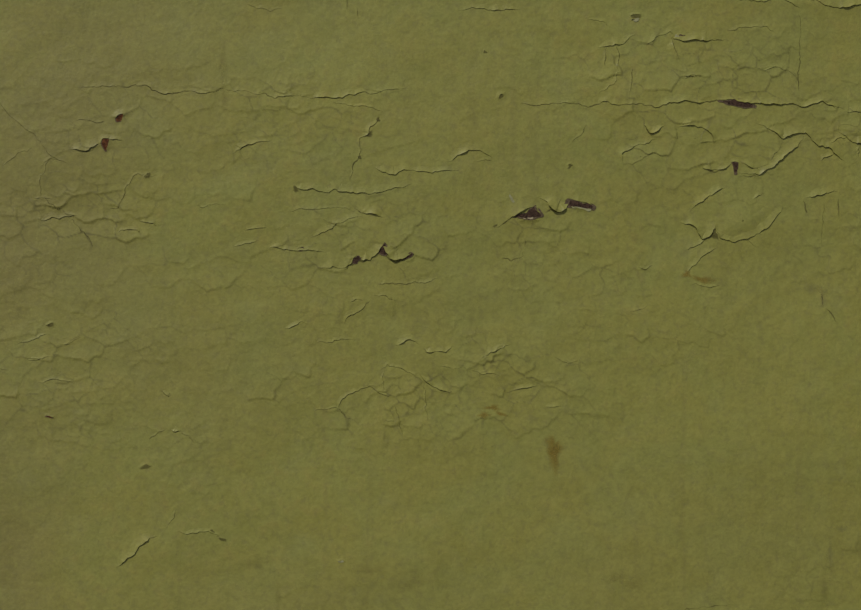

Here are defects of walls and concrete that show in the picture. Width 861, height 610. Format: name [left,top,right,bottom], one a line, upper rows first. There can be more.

peeling [701,135,804,176]
peeling [494,192,596,228]
peeling [321,242,417,269]